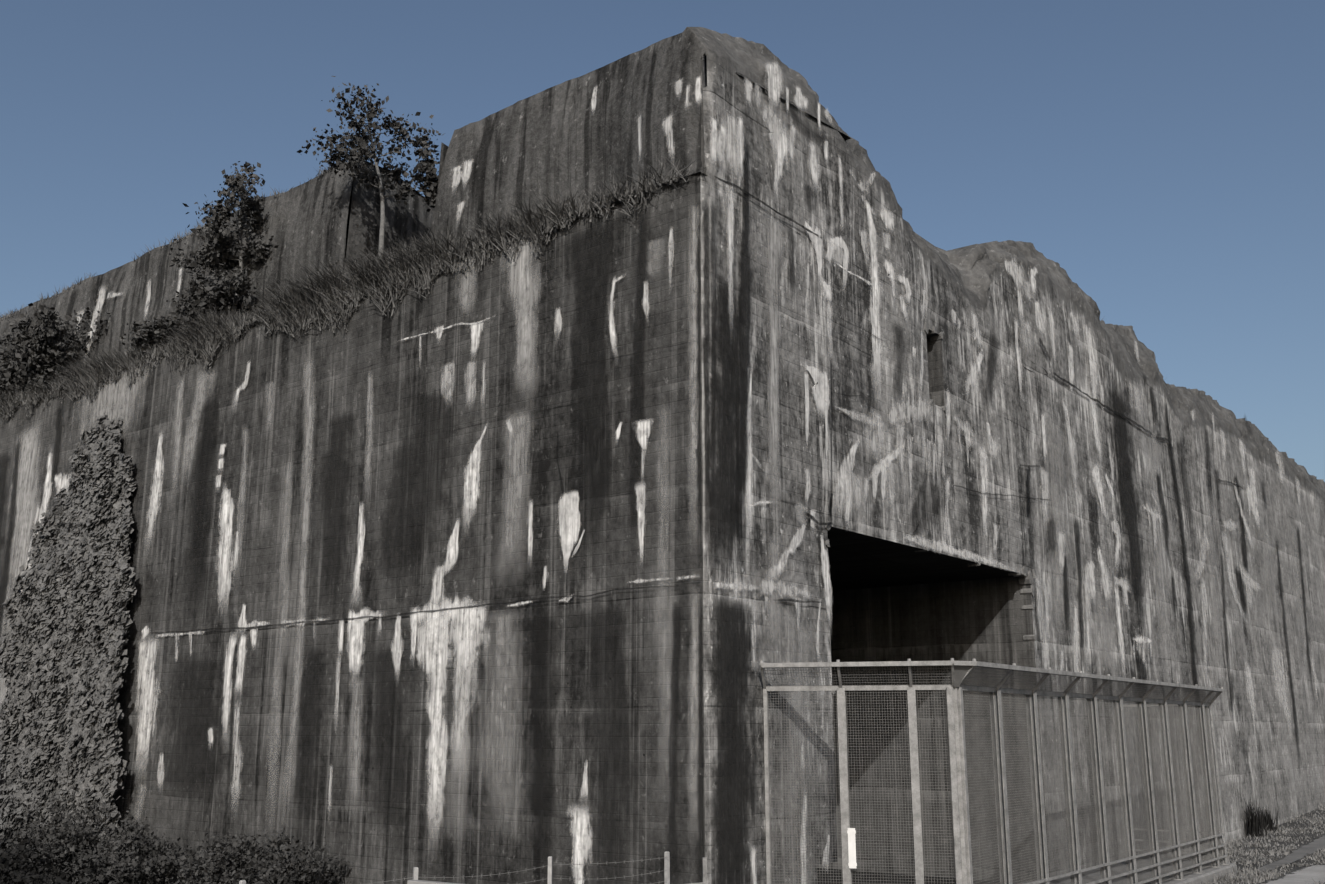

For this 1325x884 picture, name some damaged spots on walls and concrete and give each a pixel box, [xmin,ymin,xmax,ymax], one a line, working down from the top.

water stain [767,64,842,208]
water stain [508,237,538,379]
water stain [861,202,926,387]
water stain [0,408,69,721]
water stain [138,626,164,750]
water stain [149,375,246,593]
water stain [209,368,352,806]
water stain [337,429,486,814]
efflorescence [838,444,902,520]
water stain [1005,261,1156,829]
water stain [1144,378,1205,766]
water stain [1206,433,1267,707]